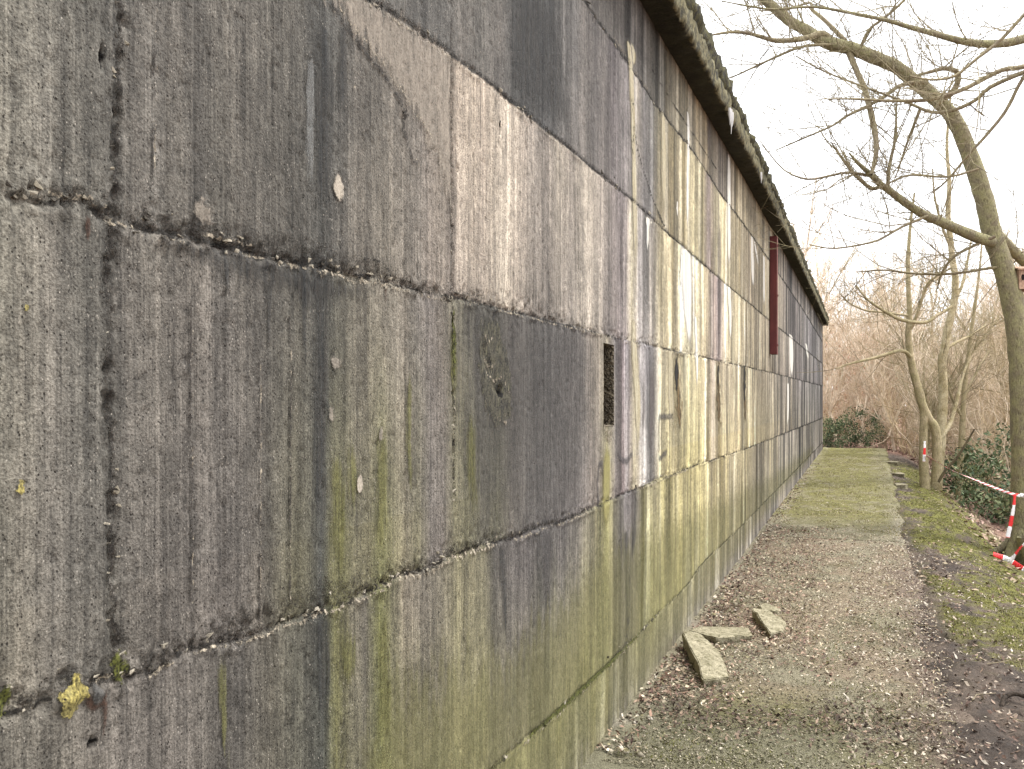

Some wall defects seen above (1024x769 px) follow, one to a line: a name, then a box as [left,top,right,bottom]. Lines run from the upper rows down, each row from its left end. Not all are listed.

leakage [676,112,690,223]
leakage [680,247,698,382]
leakage [751,236,765,301]
leakage [787,334,808,425]